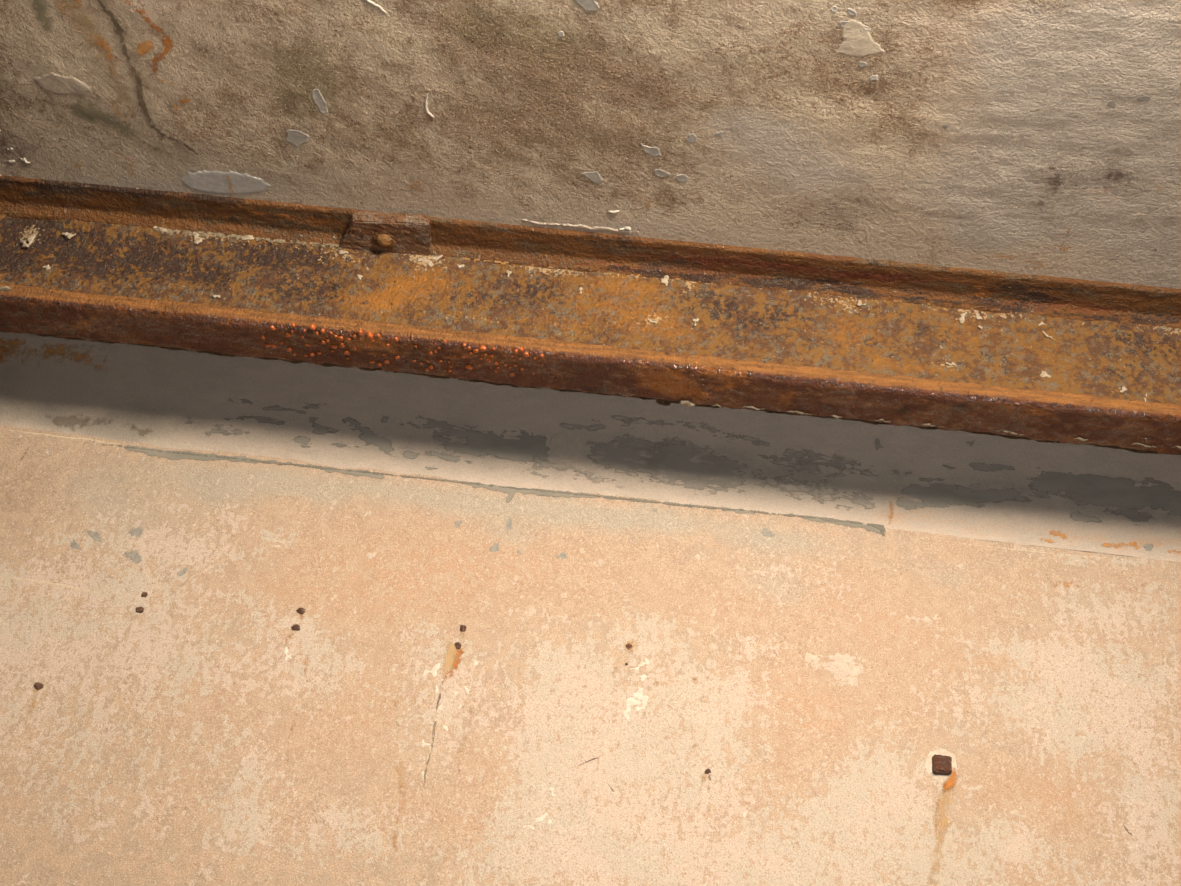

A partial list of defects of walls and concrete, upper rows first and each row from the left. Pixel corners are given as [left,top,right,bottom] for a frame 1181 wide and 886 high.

corrosion [127,0,174,84]
crack [98,0,198,155]
peeling [312,89,328,114]
peeling [641,143,689,182]
corrosion [261,323,544,377]
peeling [205,399,878,510]
peeling [891,465,1181,522]
corrosion [443,644,463,678]
corrosion [936,768,957,844]